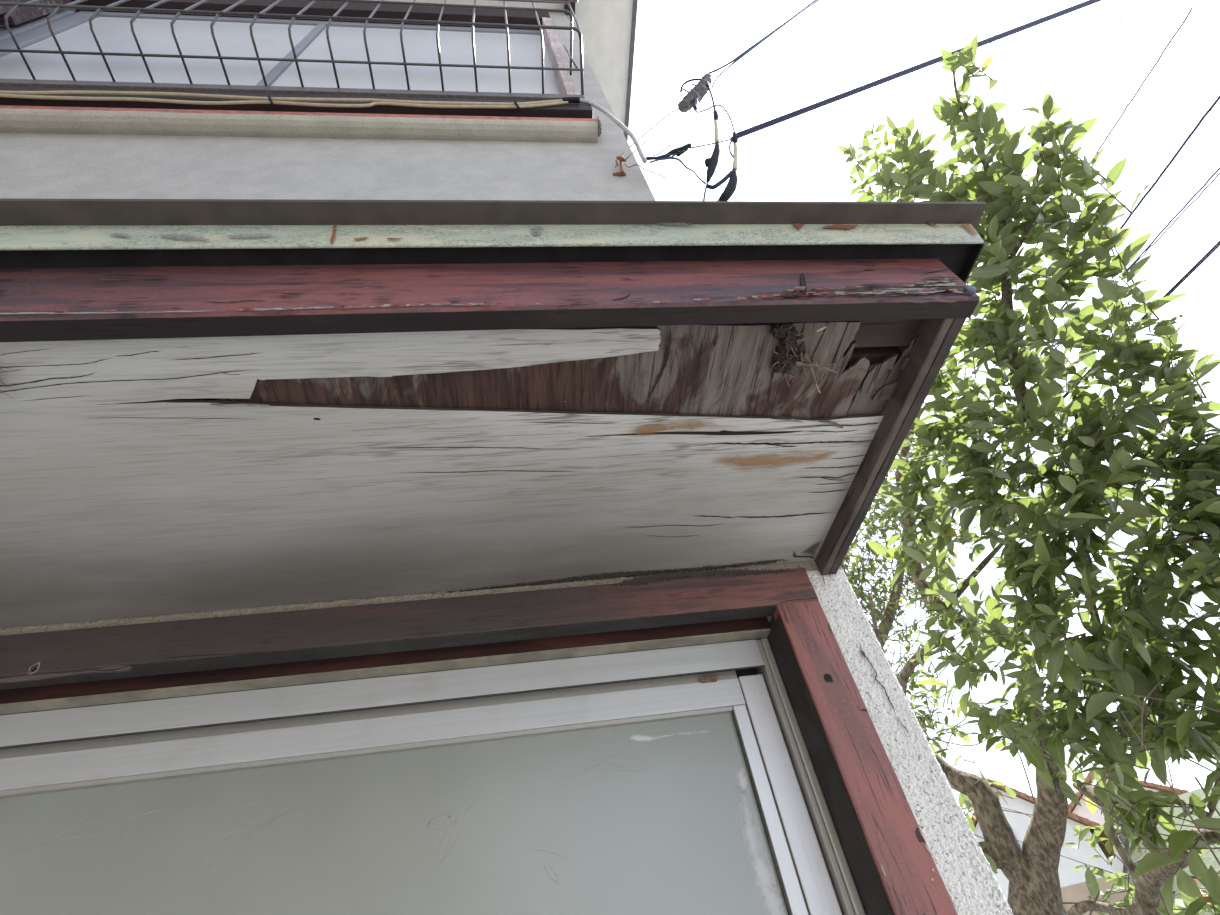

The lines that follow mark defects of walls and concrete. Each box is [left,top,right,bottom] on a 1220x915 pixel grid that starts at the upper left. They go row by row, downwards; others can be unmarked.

peeling [737,276,964,299]
peeling [0,301,502,314]
peeling [210,321,920,428]
water stain [636,423,704,434]
crack [413,422,608,473]
water stain [721,453,828,465]
crack [632,423,878,537]